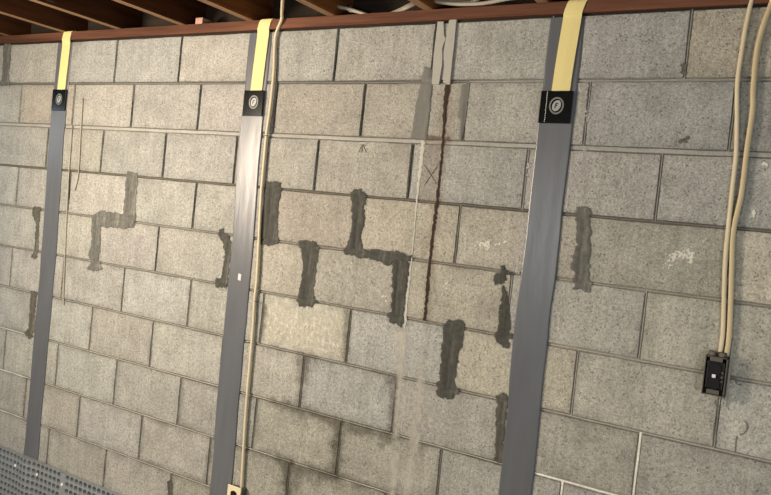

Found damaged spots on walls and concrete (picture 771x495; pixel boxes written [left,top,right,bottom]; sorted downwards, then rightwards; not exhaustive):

crack [423,85,450,321]